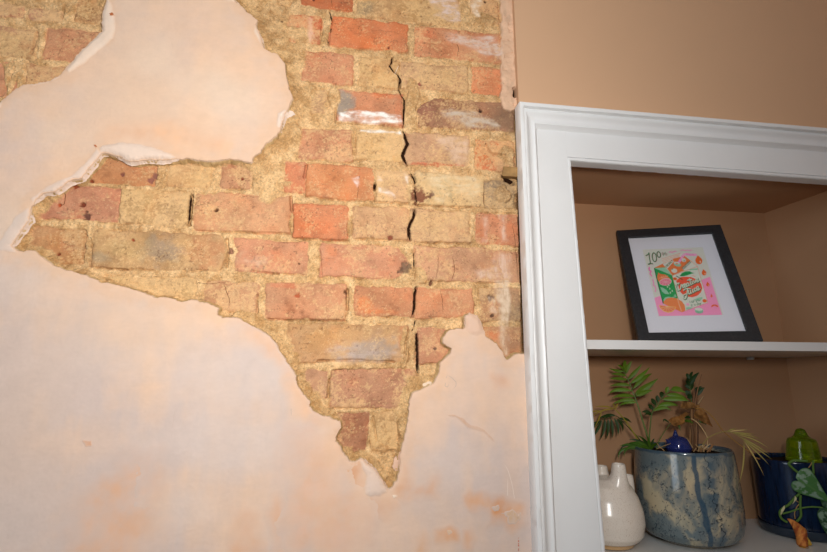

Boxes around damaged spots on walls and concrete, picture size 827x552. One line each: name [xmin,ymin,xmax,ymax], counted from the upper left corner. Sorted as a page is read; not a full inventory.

flaking render [0,0,524,497]
crack [389,59,417,266]
crack [411,287,419,369]